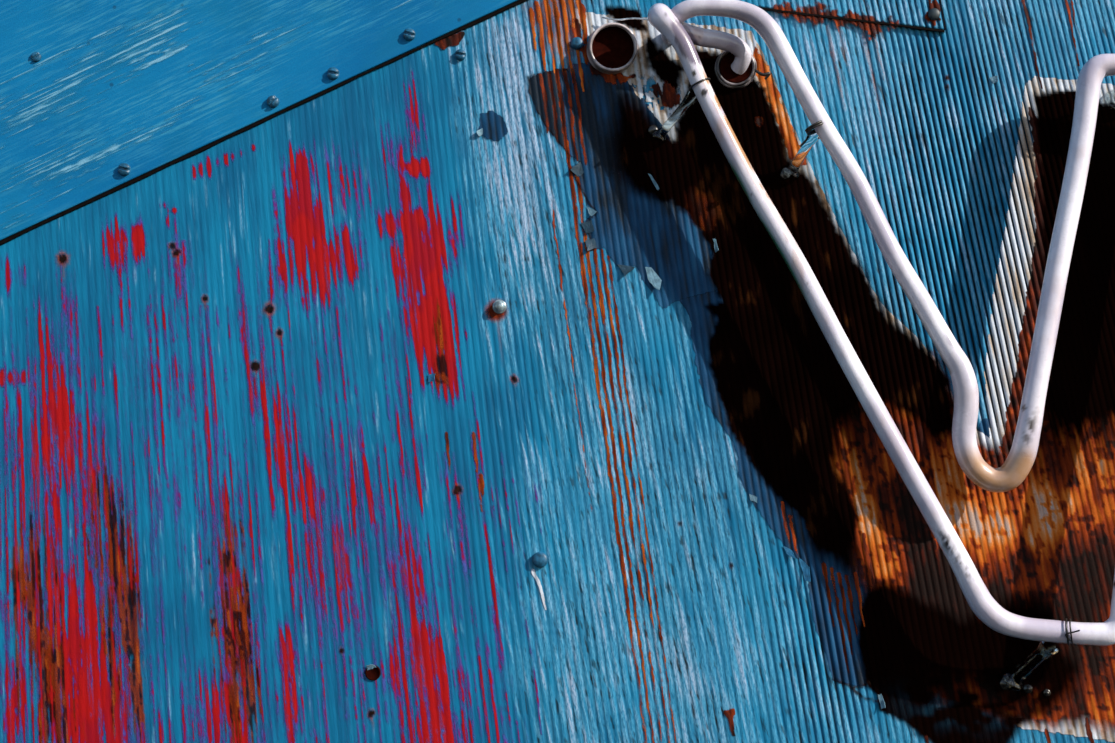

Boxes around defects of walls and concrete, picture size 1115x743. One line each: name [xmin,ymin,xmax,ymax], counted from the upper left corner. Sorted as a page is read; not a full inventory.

peeling [1099,83,1115,104]
corrosion [85,466,145,740]
peeling [0,72,520,743]
corrosion [529,0,680,743]
peeling [529,8,868,686]
corrosion [821,408,977,673]
peeling [867,280,940,367]
corrosion [885,405,1115,623]
corrosion [977,107,1045,468]
peeling [976,76,1077,449]
peeling [1018,720,1115,742]
corrosion [1028,643,1115,743]